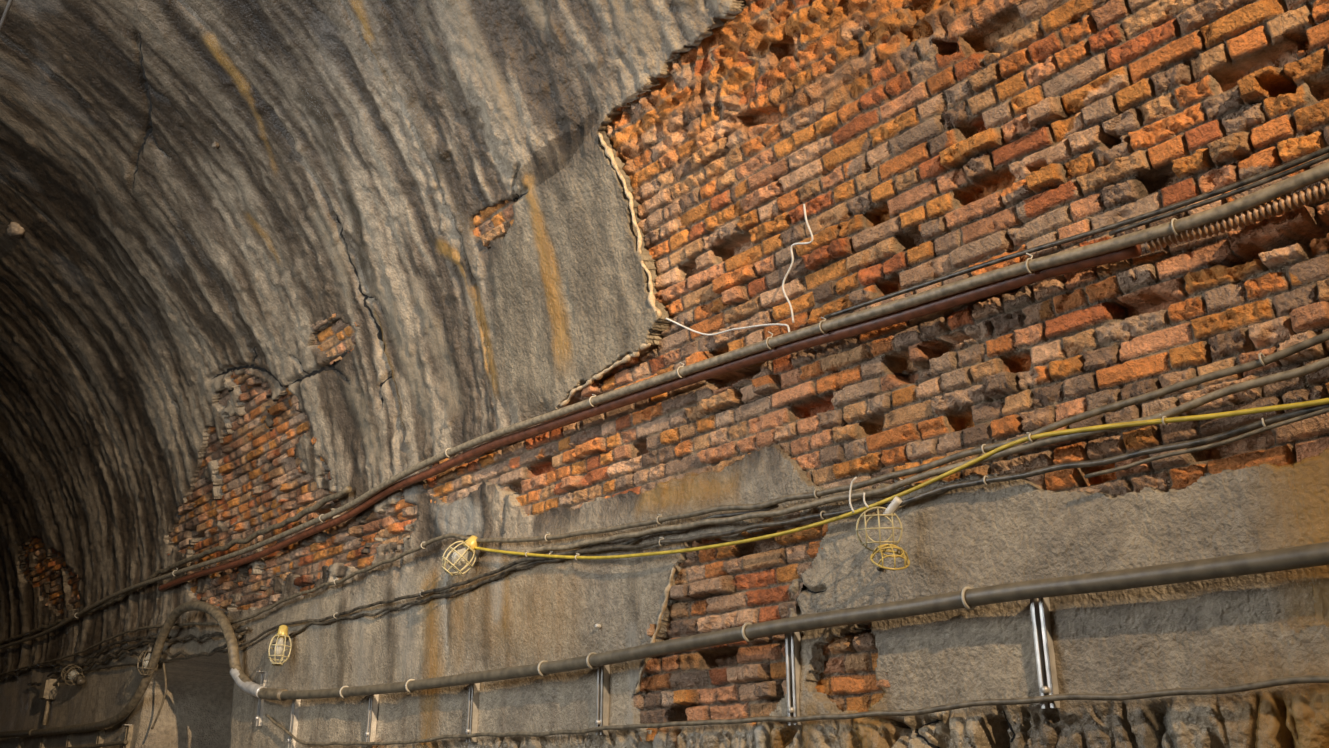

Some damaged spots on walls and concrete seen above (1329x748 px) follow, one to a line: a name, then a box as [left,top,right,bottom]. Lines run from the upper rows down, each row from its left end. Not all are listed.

rust [524,176,567,352]
spalling [168,0,1329,610]
spalling [20,537,82,615]
spalling [632,509,828,742]
spalling [815,625,890,712]